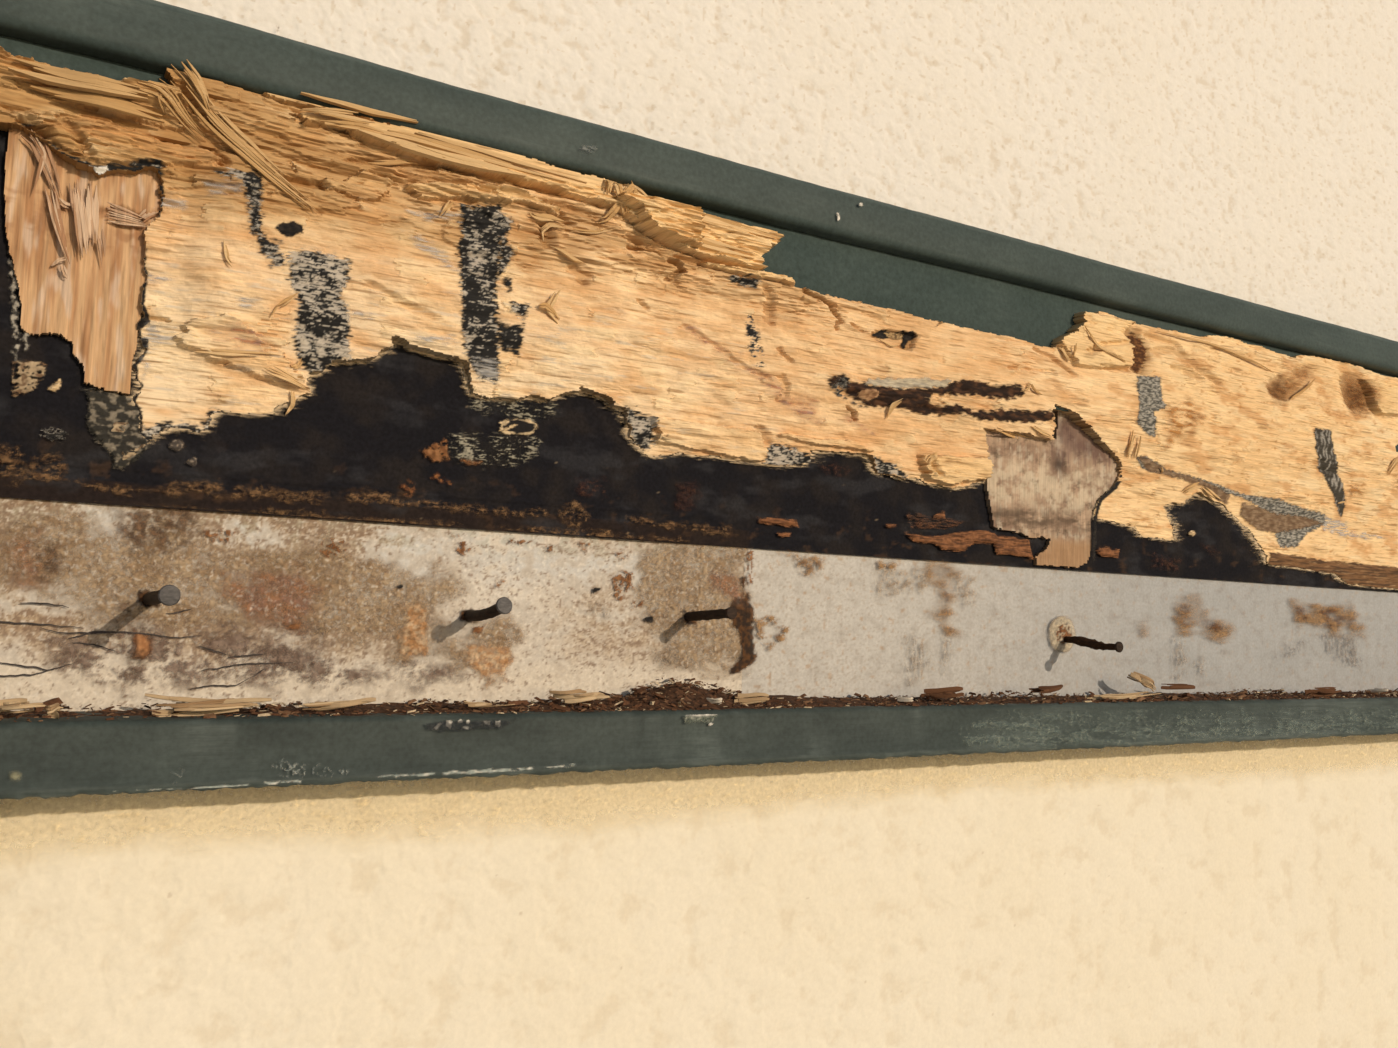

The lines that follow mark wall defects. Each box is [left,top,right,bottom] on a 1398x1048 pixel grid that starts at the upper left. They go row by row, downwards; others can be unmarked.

peeling [497,234,530,357]
spalling [828,374,1055,423]
peeling [423,440,449,462]
peeling [499,419,537,435]
rust [119,508,235,550]
peeling [759,517,798,537]
peeling [886,512,1033,559]
crack [0,602,292,689]
rust [446,609,524,685]
rust [593,552,653,623]
rust [731,550,789,674]
rust [1050,616,1076,652]